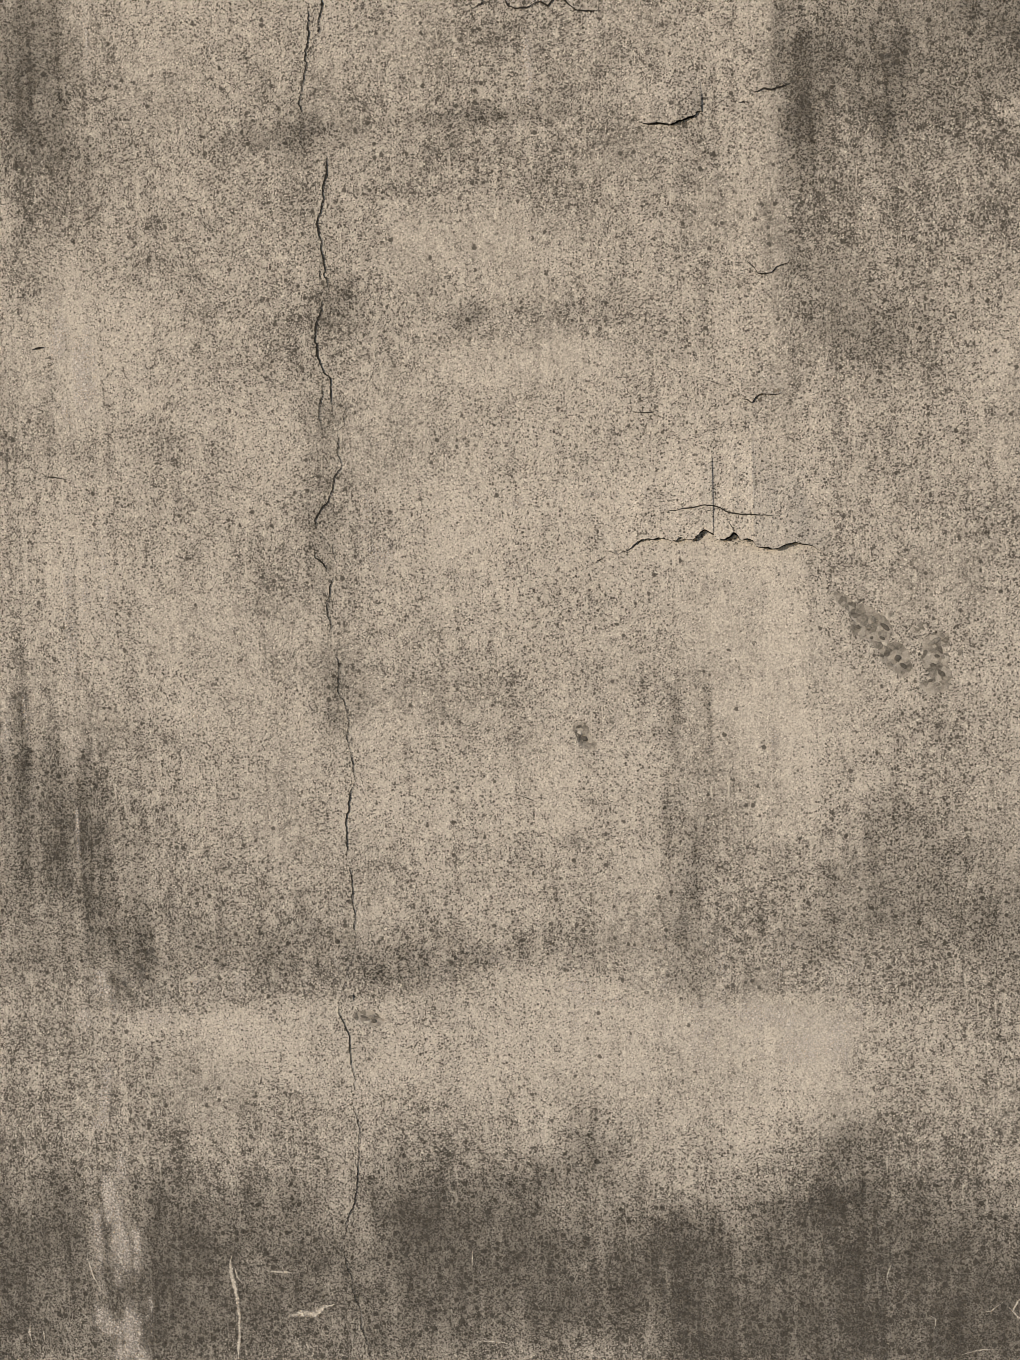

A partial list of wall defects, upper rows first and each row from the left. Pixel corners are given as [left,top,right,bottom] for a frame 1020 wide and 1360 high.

leakage [0,0,112,236]
flaking render [634,66,703,125]
leakage [768,0,1020,197]
leakage [783,237,932,364]
flaking render [593,433,827,564]
crack [297,0,370,1356]
leakage [0,1064,1020,1360]